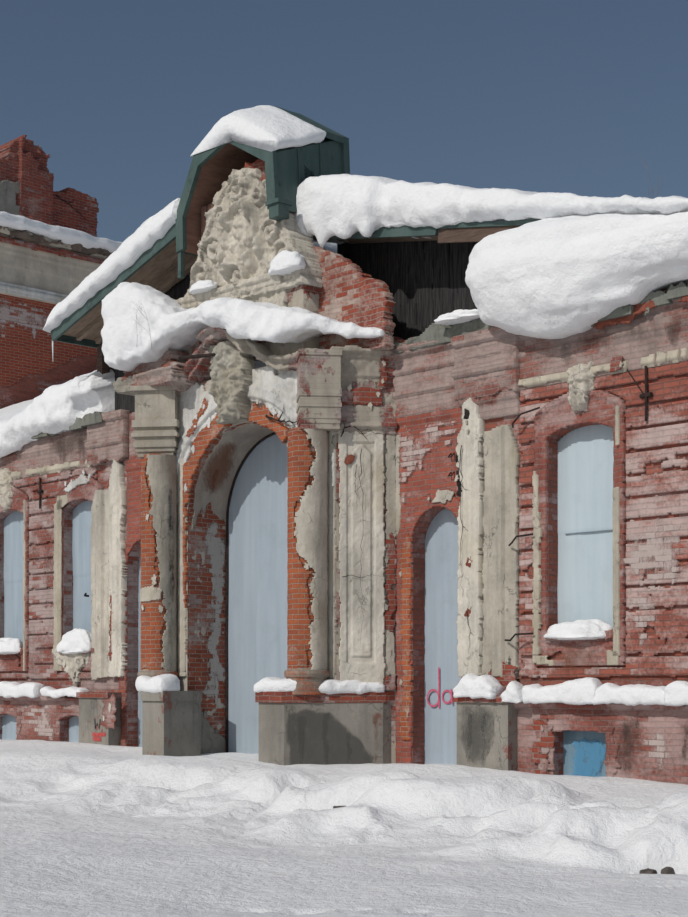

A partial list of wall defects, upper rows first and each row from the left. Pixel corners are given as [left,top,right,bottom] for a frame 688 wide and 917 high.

peeling [140,460,166,670]
peeling [182,398,232,608]
peeling [203,522,226,703]
corrosion [207,445,234,489]
peeling [249,398,315,669]
crack [340,424,381,643]
peeling [341,358,389,409]
spalling [591,299,657,330]
water stain [287,710,372,765]
water stain [464,709,491,759]